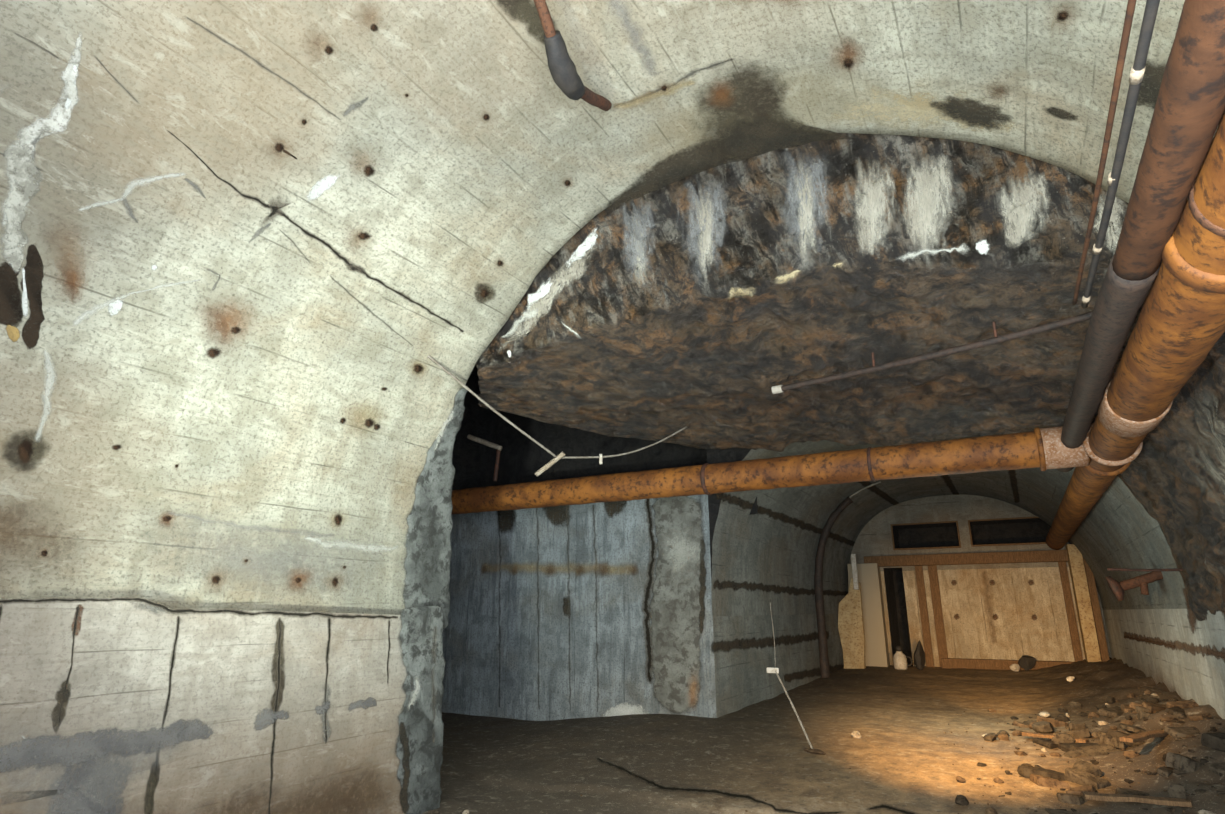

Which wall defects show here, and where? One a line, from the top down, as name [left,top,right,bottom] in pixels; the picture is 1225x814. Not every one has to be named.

water stain [834,87,1014,131]
water stain [1046,107,1077,120]
crack [167,130,464,346]
water stain [503,67,854,357]
water stain [857,170,894,251]
water stain [904,157,989,258]
water stain [1001,177,1046,244]
spalling [0,244,45,349]
rust [207,310,240,358]
crack [0,597,398,814]